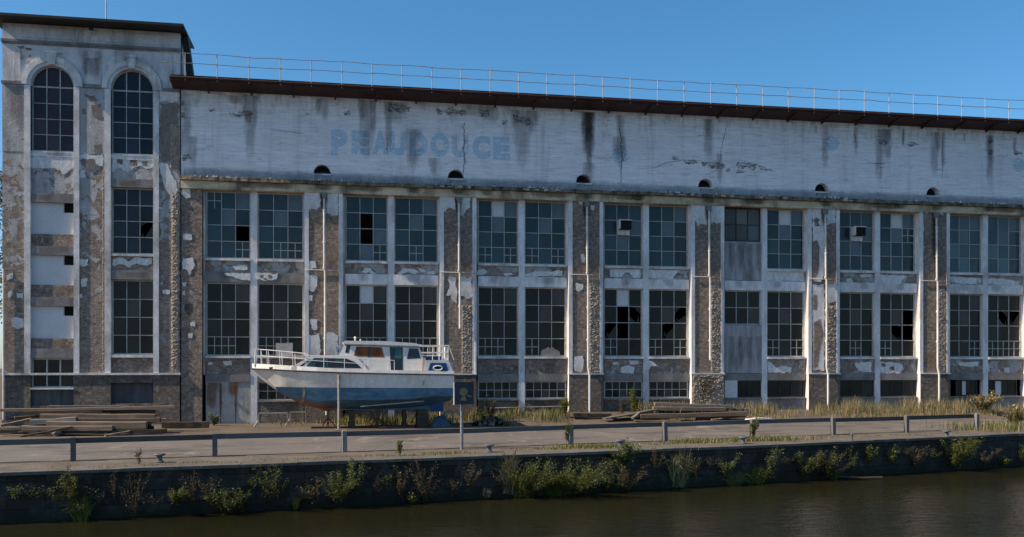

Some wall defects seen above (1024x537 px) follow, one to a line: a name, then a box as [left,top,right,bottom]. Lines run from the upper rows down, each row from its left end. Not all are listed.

spalling [31,91,195,372]
spalling [447,269,487,373]
crack [614,115,728,179]
peeling [767,198,906,373]